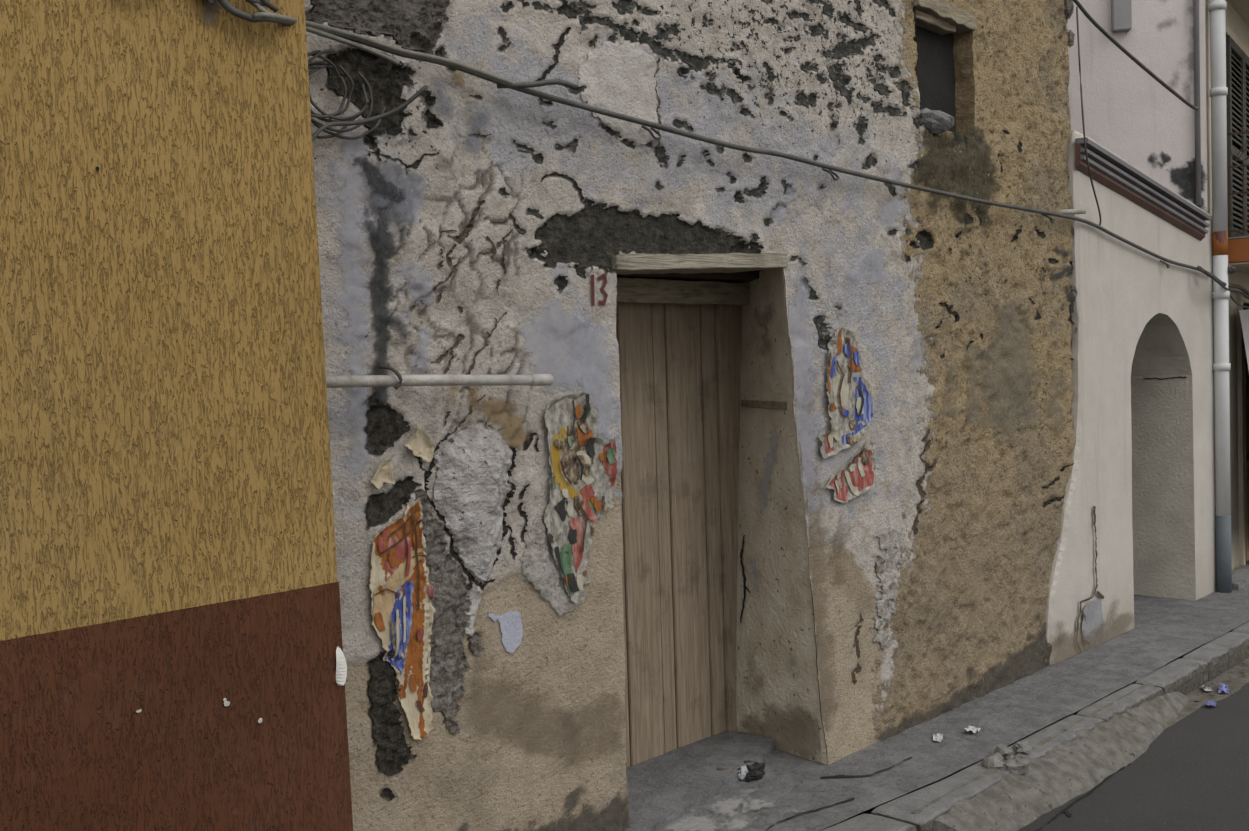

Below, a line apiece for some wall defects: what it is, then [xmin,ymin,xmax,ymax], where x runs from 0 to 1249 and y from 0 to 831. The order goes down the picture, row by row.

peeling [501,0,923,169]
spalling [524,172,796,293]
peeling [791,255,819,299]
damp [954,191,993,233]
flaking render [364,396,411,455]
crack [410,200,540,591]
flaking render [366,476,485,736]
crack [740,535,750,623]
peeling [870,525,908,649]
flaking render [367,652,417,801]
damp [500,787,630,831]